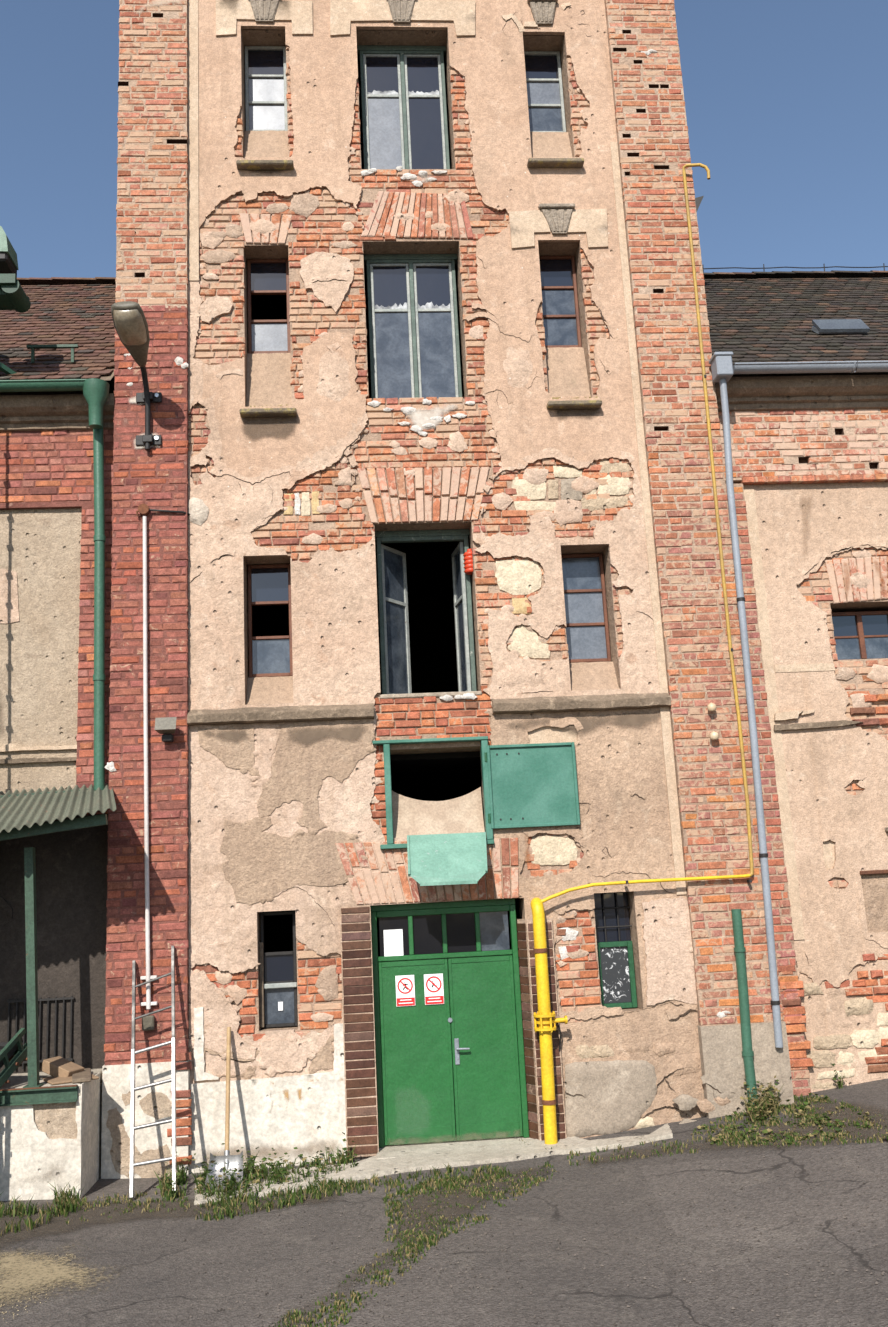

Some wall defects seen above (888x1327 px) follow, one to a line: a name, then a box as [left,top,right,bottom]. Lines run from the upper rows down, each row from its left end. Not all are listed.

spalling [188,396,220,485]
flaking render [194,46,639,905]
flaking render [795,545,888,740]
flaking render [176,958,266,1080]
flaking render [294,938,343,1074]